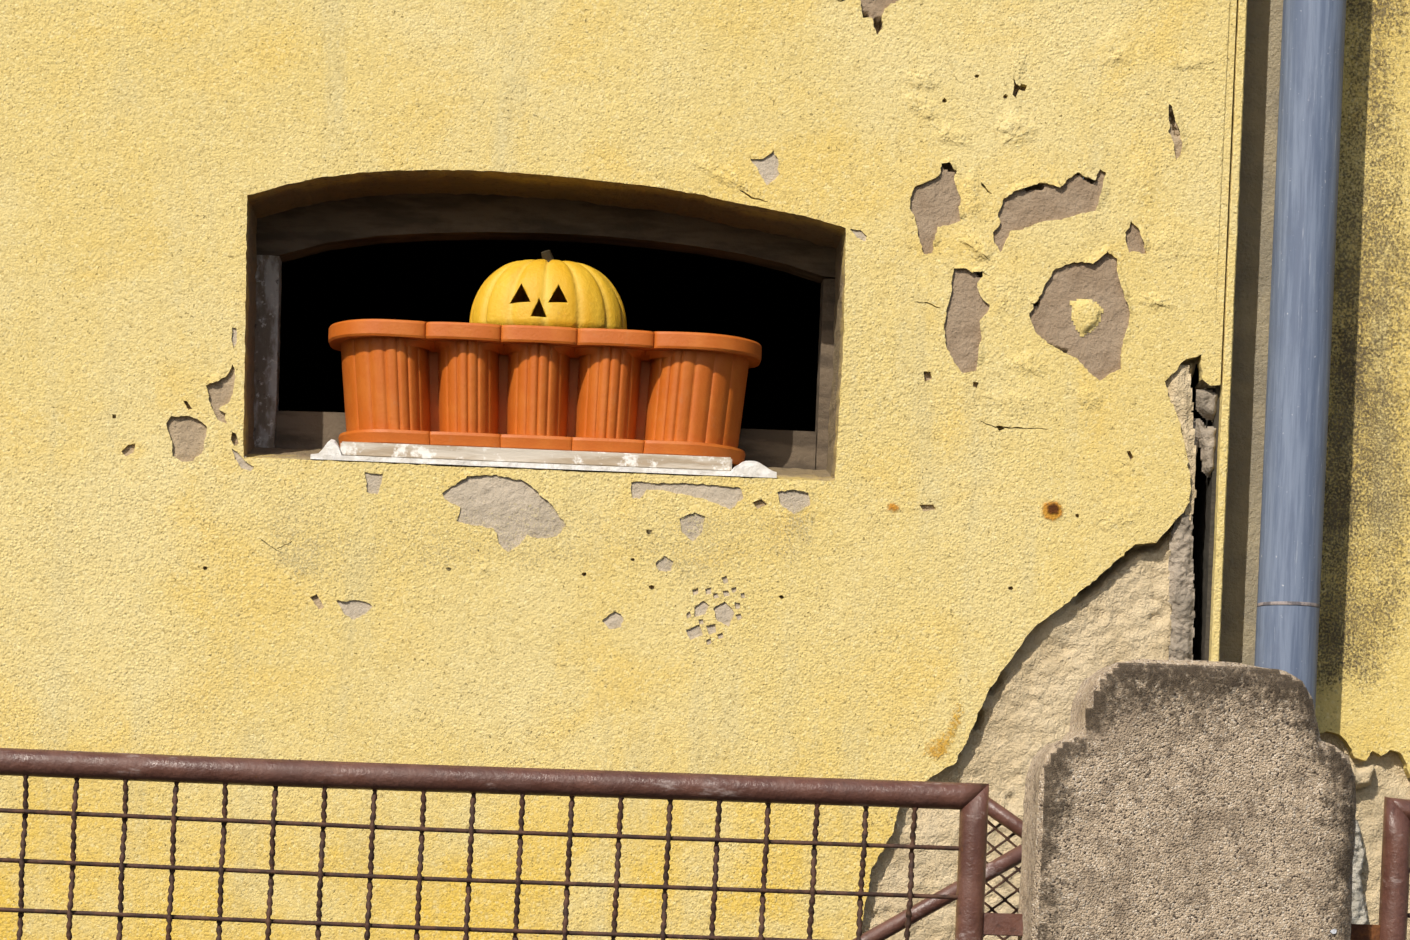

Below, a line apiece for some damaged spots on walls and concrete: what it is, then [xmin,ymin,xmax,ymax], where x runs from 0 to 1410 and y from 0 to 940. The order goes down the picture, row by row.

peeling [861,0,899,35]
peeling [910,156,967,254]
peeling [993,170,1111,252]
peeling [944,264,994,388]
peeling [1028,222,1151,380]
peeling [167,366,254,471]
peeling [631,479,816,541]
rust [1043,501,1062,521]
crack [1190,364,1218,478]
leakage [1037,0,1410,940]
flaking render [927,357,1215,914]
flaking render [862,808,960,940]